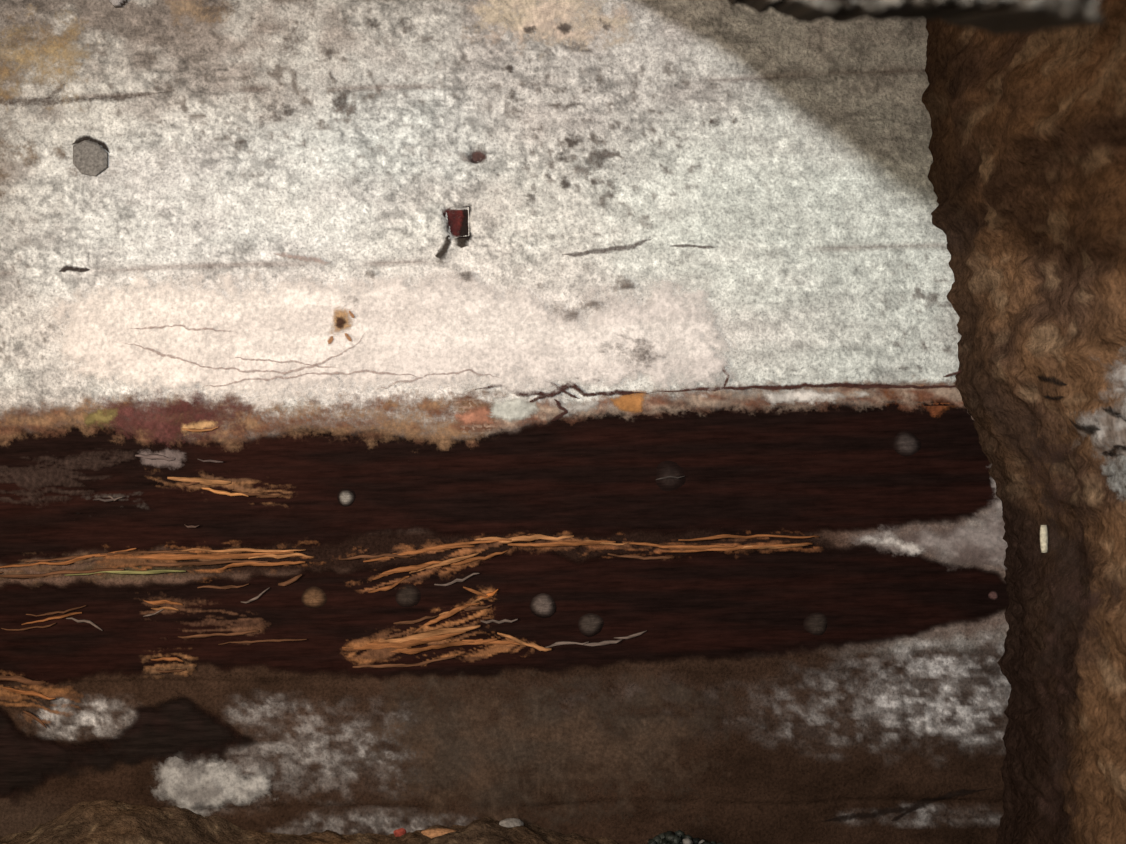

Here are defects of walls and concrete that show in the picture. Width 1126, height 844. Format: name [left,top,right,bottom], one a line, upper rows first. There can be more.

crack [475,366,961,422]
damp [1077,361,1126,496]
damp [364,677,716,825]